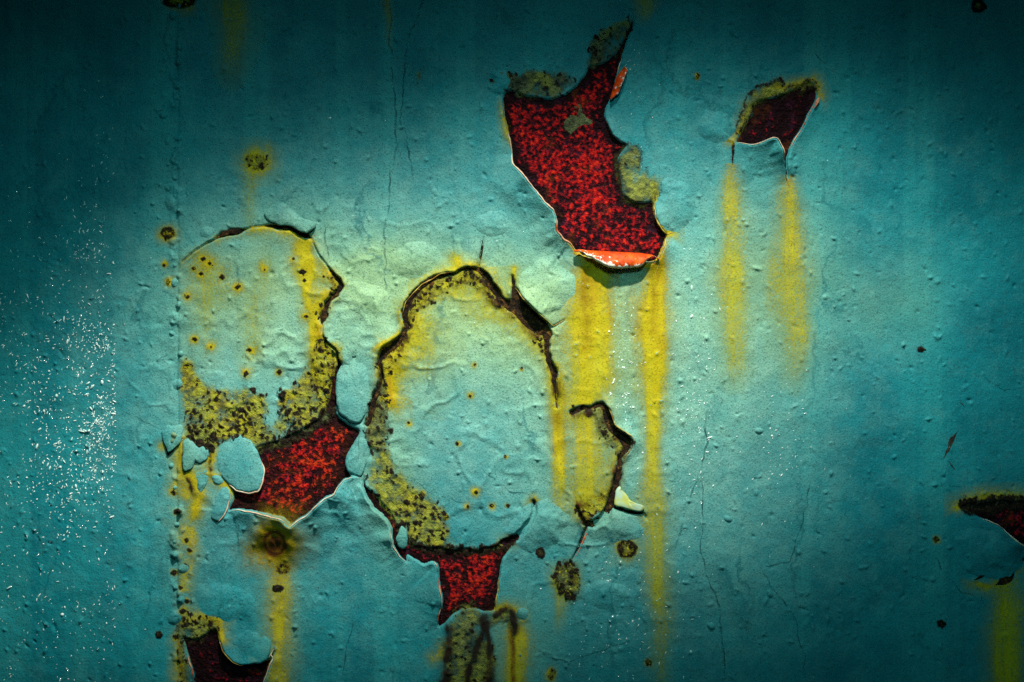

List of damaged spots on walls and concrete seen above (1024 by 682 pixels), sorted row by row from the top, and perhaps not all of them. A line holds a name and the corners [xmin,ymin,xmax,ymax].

corrosion [243,146,274,180]
peeling [488,14,696,283]
peeling [697,76,824,186]
spalling [191,253,243,294]
corrosion [718,165,746,369]
corrosion [771,176,808,351]
peeling [160,318,529,682]
corrosion [505,625,528,682]
corrosion [551,559,580,615]
corrosion [550,260,618,510]
corrosion [615,252,669,677]
peeling [952,489,1024,591]